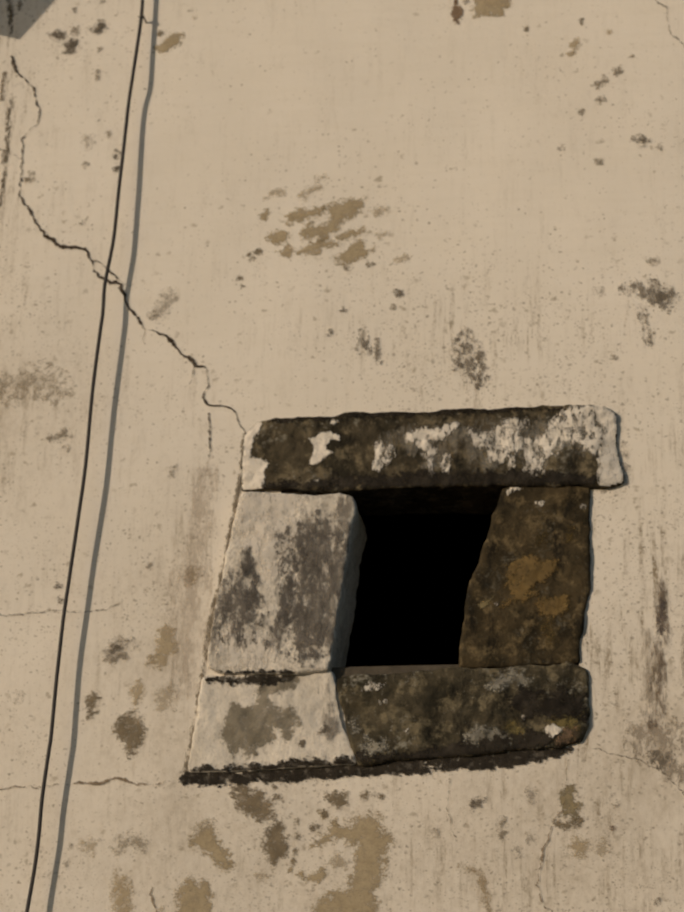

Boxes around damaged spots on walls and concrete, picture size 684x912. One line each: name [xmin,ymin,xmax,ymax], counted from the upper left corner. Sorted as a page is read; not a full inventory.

water stain [6,0,23,34]
peeling [470,0,510,19]
water stain [0,71,14,206]
peeling [264,176,390,270]
crack [0,55,246,772]
crack [0,777,160,790]
peeling [174,876,214,912]
peeling [229,783,394,912]
crack [535,804,564,909]